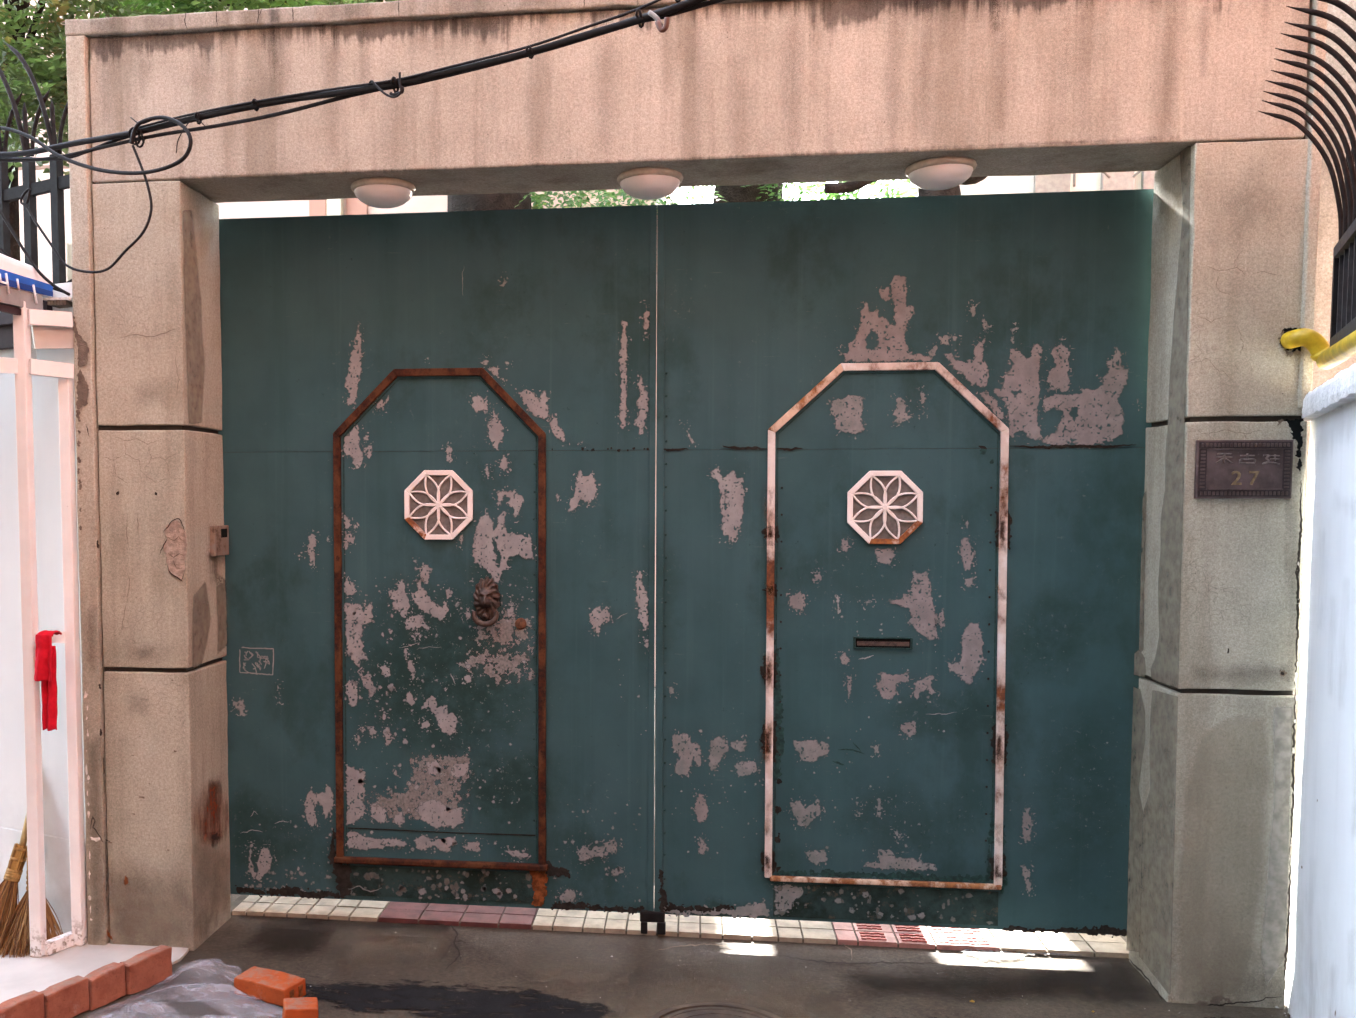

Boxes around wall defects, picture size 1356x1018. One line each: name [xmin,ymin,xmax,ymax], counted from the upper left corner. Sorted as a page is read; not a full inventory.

peeling [341,321,389,469]
peeling [615,300,650,439]
peeling [836,275,1142,449]
peeling [706,464,748,548]
corrosion [761,514,780,545]
corrosion [994,492,1012,550]
peeling [240,355,586,901]
peeling [669,729,764,859]
corrosion [759,639,785,784]
corrosion [760,806,1008,894]
peeling [786,545,987,875]
corrosion [990,724,1009,766]